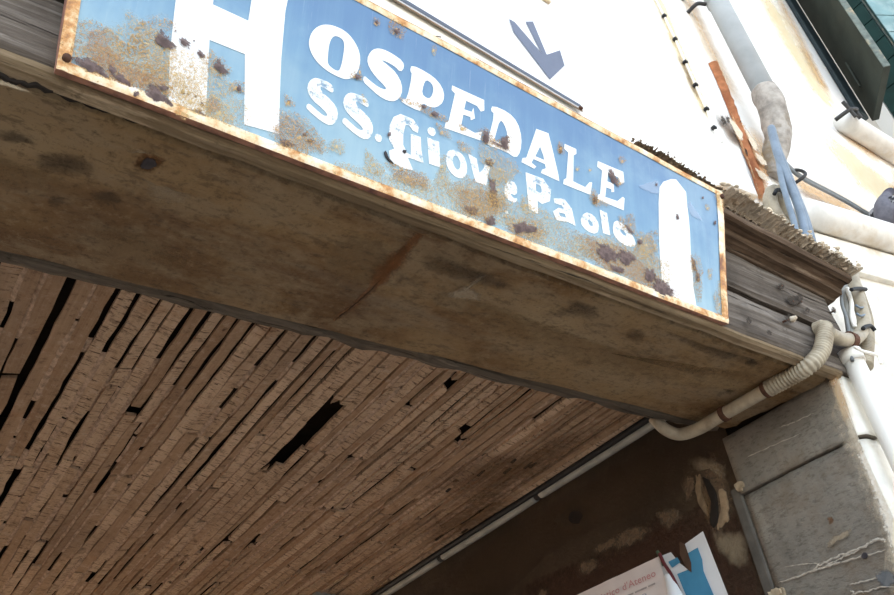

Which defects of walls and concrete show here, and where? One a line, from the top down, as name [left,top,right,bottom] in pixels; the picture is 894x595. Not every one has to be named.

rust [333,233,423,321]
peeling [521,453,758,595]
peeling [768,587,786,595]